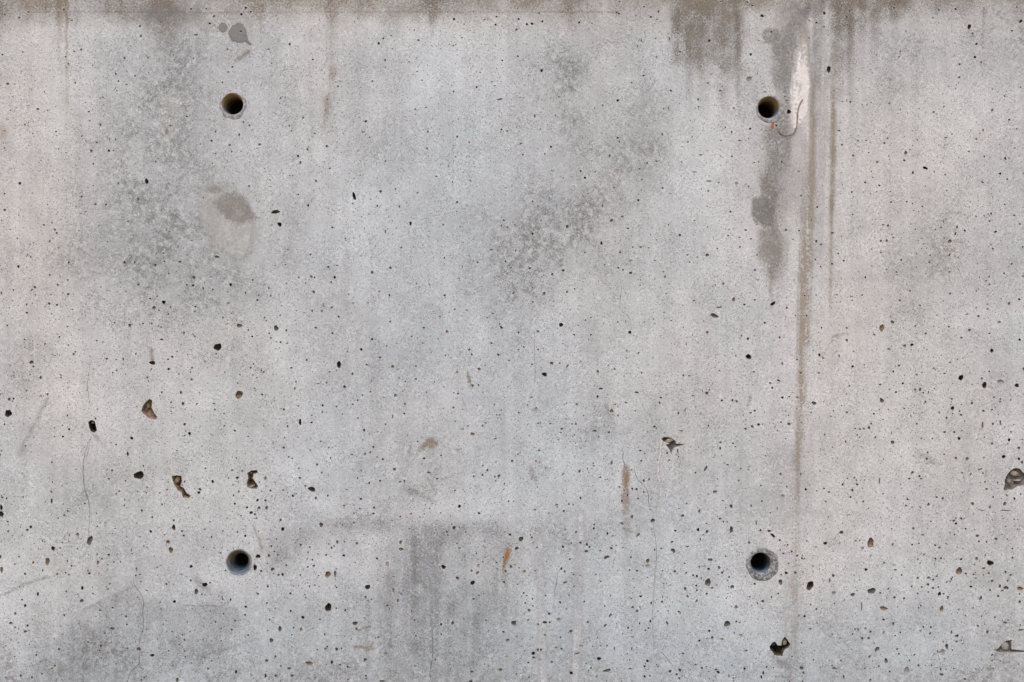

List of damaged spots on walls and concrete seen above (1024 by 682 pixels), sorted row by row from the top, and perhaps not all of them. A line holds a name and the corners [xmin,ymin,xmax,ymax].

water stain [674,0,772,59]
water stain [752,173,781,264]
water stain [765,0,866,470]